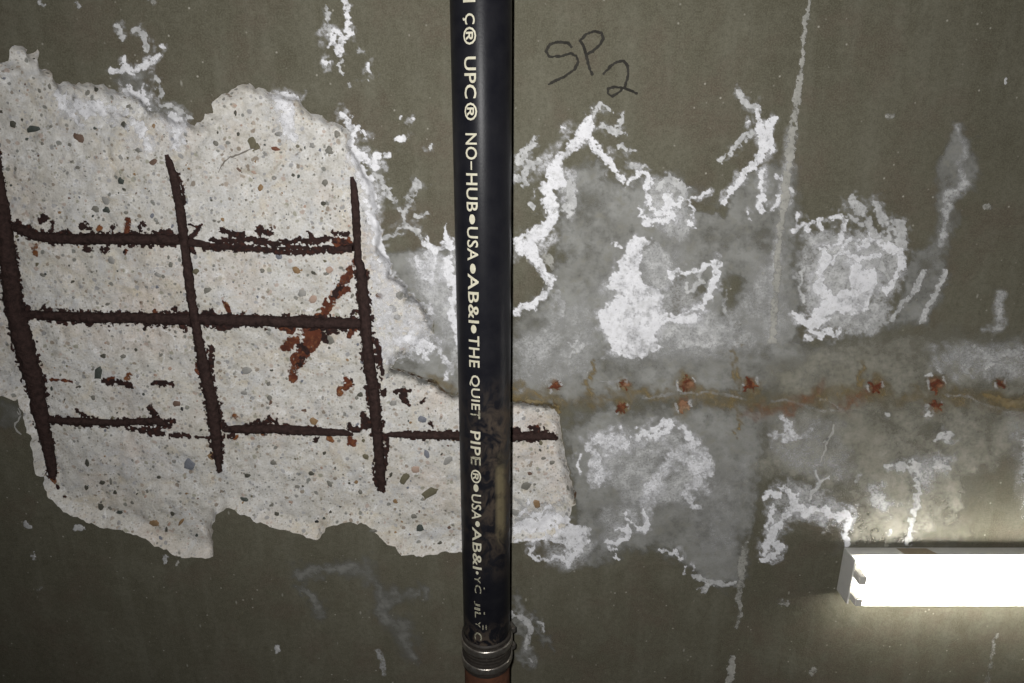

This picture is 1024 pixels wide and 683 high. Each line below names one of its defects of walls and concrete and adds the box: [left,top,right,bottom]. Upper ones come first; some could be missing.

damp [270,91,299,142]
damp [339,109,458,394]
spalling [0,45,462,559]
corrosion [280,258,355,383]
corrosion [101,372,134,389]
corrosion [150,380,175,388]
corrosion [336,376,355,396]
corrosion [393,388,426,407]
crack [391,369,456,397]
crack [511,399,561,414]
damp [511,89,1024,629]
spalling [510,402,576,543]